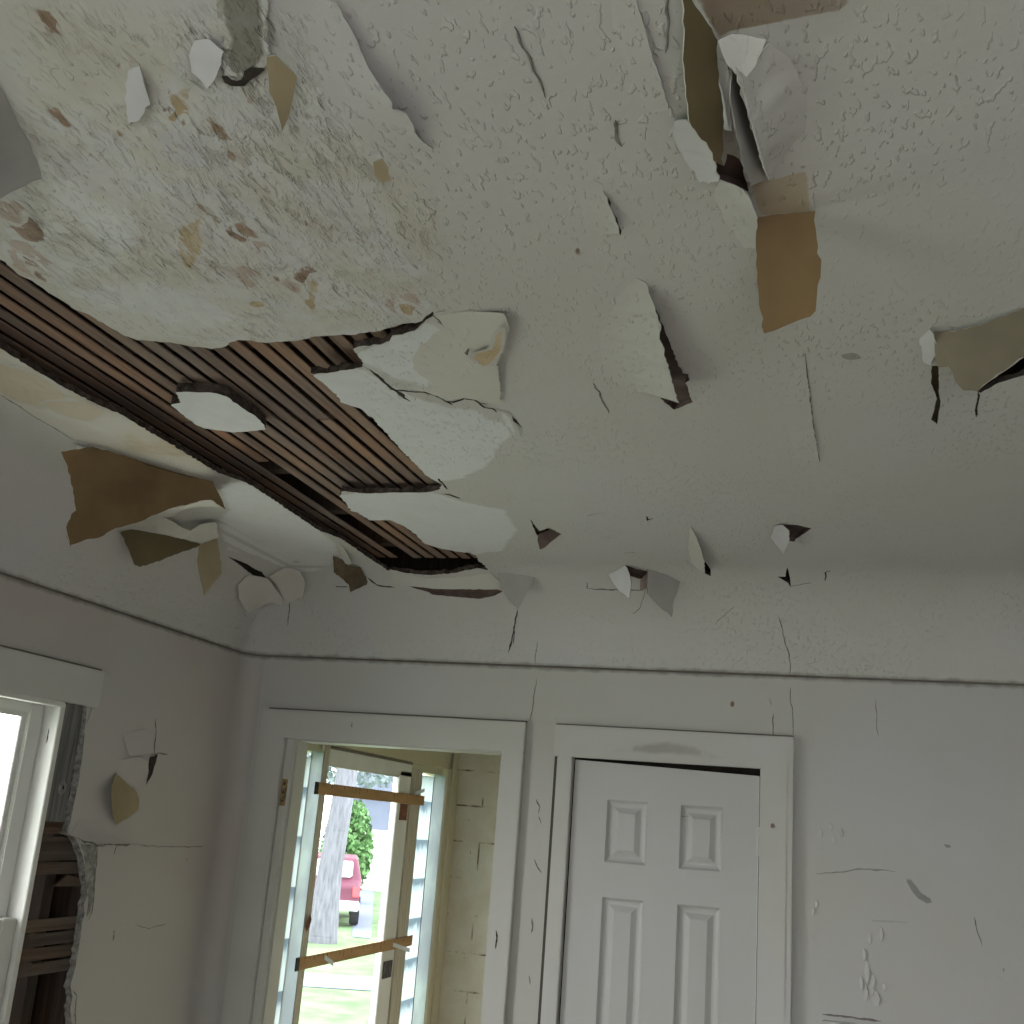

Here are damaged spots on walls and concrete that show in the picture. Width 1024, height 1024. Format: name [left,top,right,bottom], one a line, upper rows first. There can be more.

crack [514,26,545,97]
peeling [672,0,855,334]
peeling [0,311,561,613]
peeling [598,278,692,410]
crack [805,353,820,461]
peeling [919,308,1024,424]
peeling [609,565,680,617]
peeling [771,524,811,554]
crack [508,609,537,719]
spalling [59,706,98,1024]
crack [72,818,202,853]
crack [820,867,895,875]